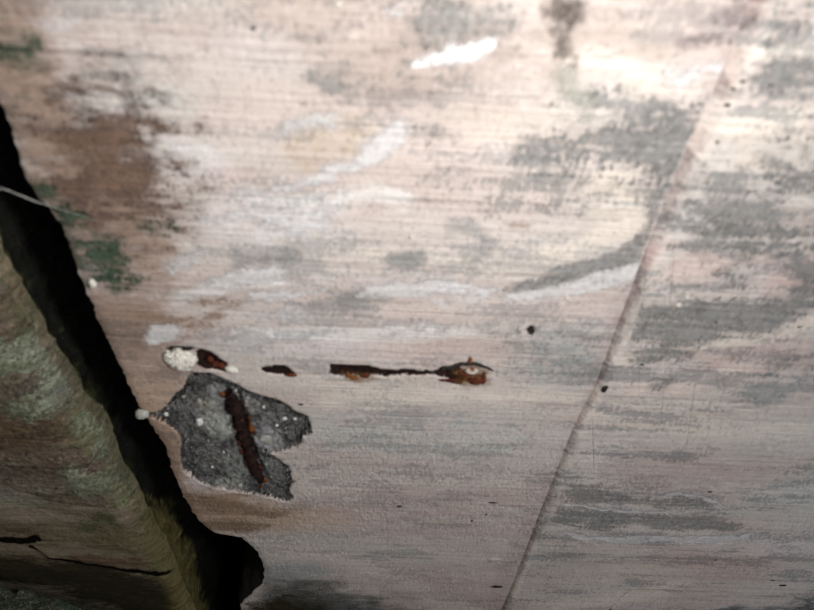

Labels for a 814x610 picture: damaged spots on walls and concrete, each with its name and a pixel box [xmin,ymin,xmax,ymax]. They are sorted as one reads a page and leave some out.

leakage [26,72,339,235]
corrosion [196,349,228,372]
corrosion [262,365,297,377]
spalling [149,371,313,501]
crack [0,535,173,576]